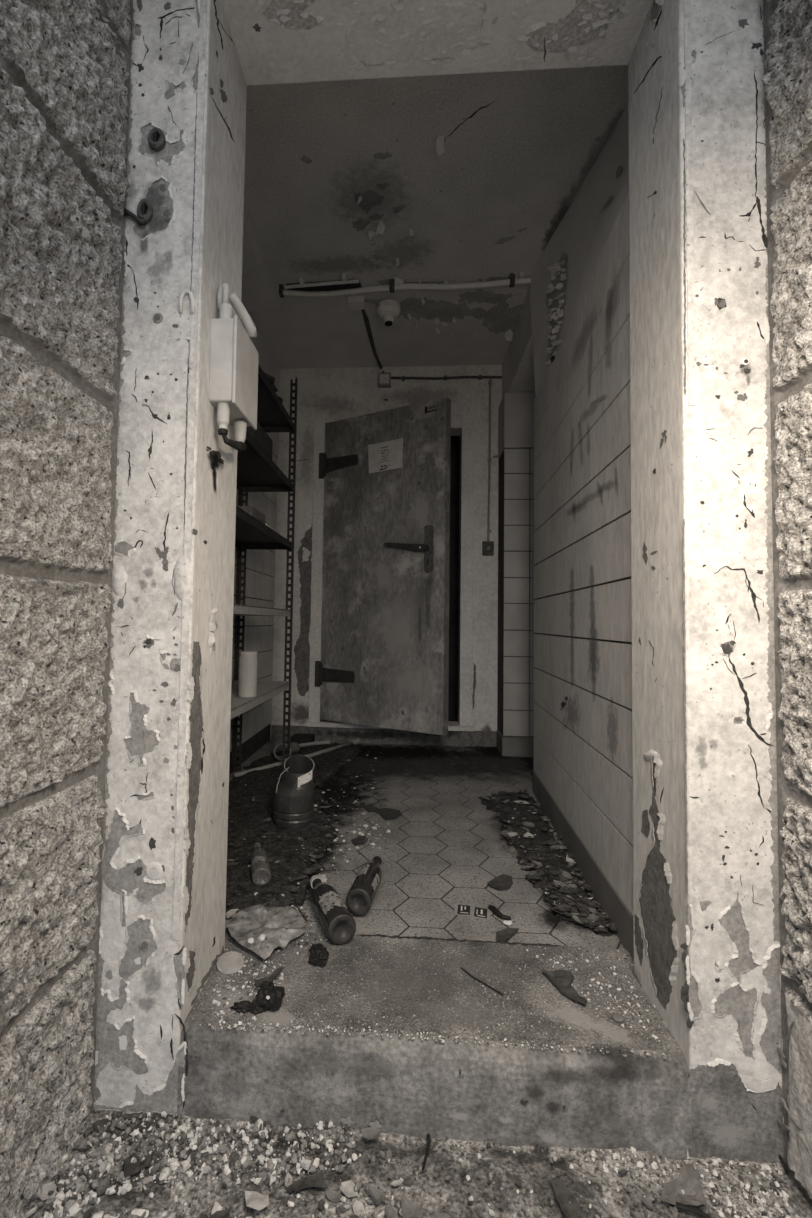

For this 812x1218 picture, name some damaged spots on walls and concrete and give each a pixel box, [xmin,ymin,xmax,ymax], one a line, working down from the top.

crack [125,355,189,549]
crack [158,0,235,291]
peeling [252,0,324,32]
crack [446,101,495,138]
peeling [545,252,567,364]
peeling [516,0,628,62]
crack [683,71,768,395]
peeling [123,608,218,1009]
crack [638,519,699,892]
crack [714,566,773,845]
peeling [93,807,197,1115]
spalling [634,753,784,1163]